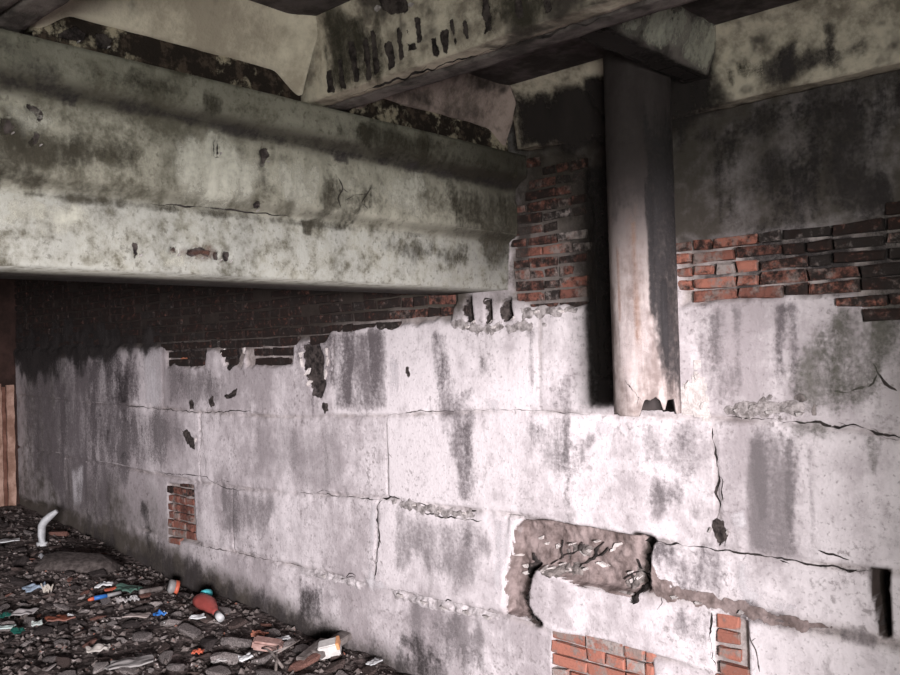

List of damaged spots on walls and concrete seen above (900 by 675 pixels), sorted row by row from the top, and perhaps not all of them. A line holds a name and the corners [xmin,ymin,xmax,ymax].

damp [0,117,133,186]
damp [179,132,264,217]
spalling [450,298,578,335]
flaking render [220,339,246,371]
flaking render [298,342,330,414]
damp [343,335,353,401]
crack [835,364,897,393]
crack [300,409,582,580]
damp [734,435,794,549]
crack [712,416,900,519]
spalling [504,519,657,618]
crack [657,539,868,573]